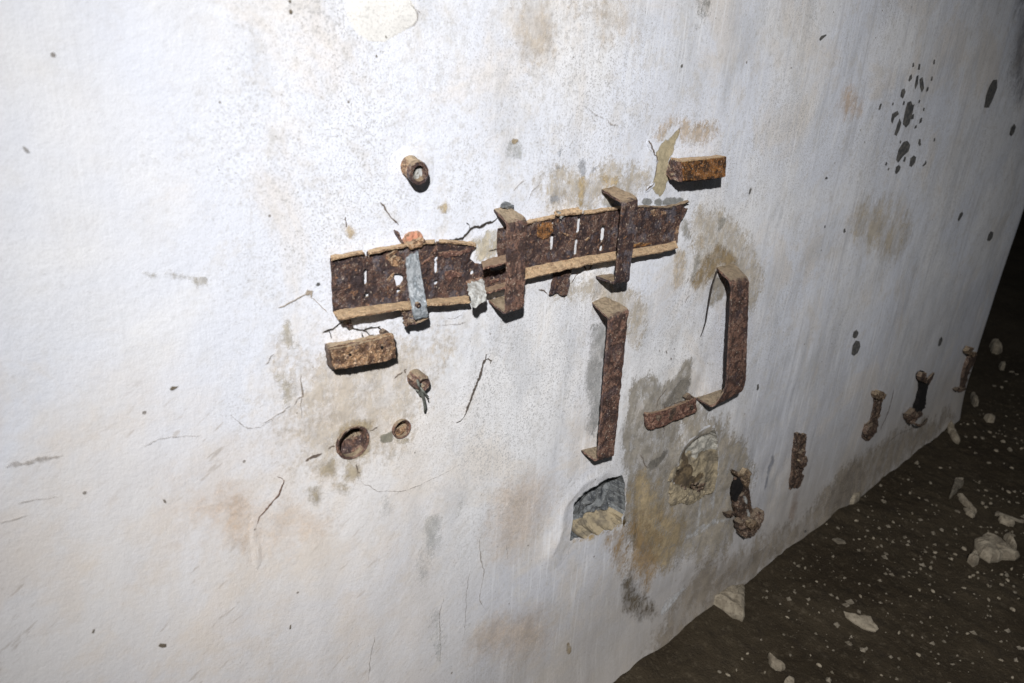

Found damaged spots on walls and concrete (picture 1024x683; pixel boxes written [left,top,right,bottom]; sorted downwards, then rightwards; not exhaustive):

crack [457,354,492,423]
flaking render [570,359,718,551]
leakage [607,451,724,584]
corrosion [797,449,808,468]
leakage [654,412,951,651]